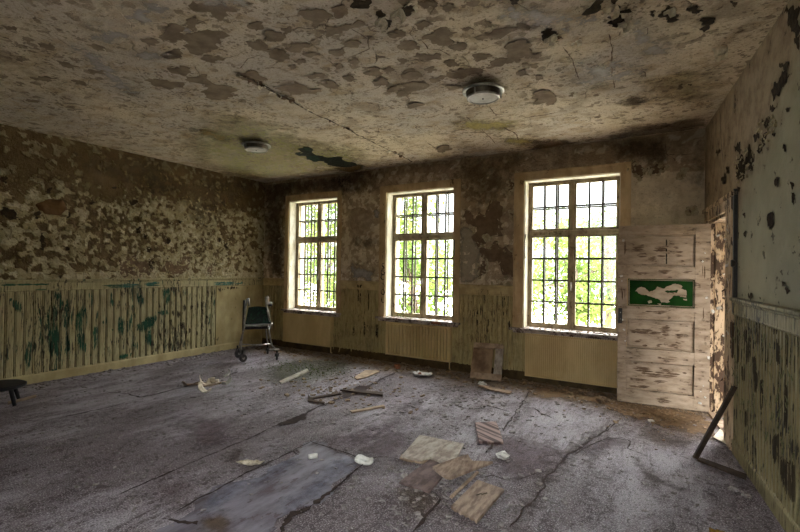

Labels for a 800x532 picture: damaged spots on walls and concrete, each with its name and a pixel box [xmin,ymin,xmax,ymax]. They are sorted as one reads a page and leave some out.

peeling [140,1,238,100]
peeling [235,0,562,109]
flaking render [582,0,632,33]
flaking render [650,5,715,32]
flaking render [784,5,800,50]
crack [239,55,414,163]
flaking render [721,62,789,192]
peeling [0,173,243,359]
peeling [460,200,518,286]
crack [458,391,554,454]
crack [413,499,441,532]
crack [482,421,648,529]